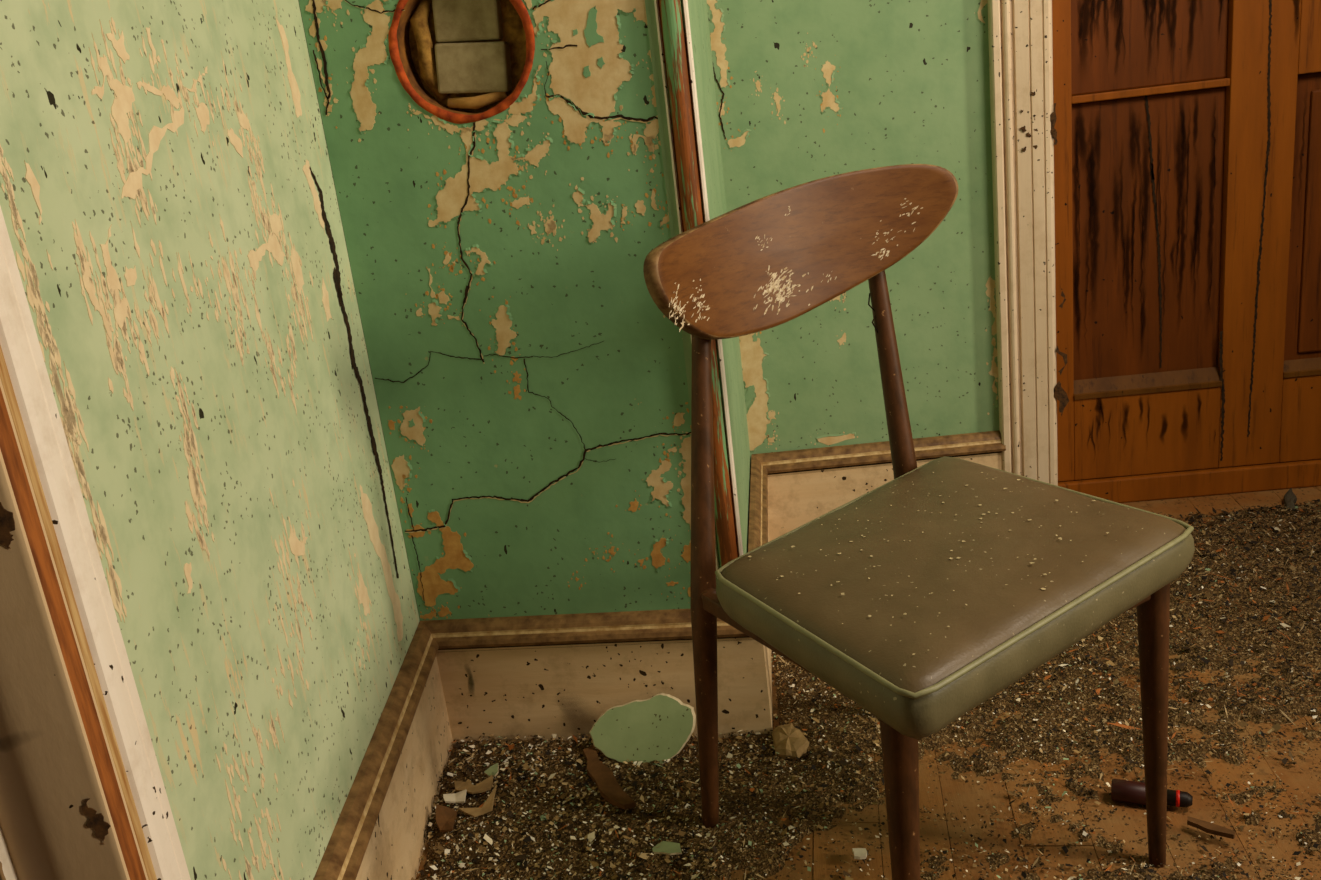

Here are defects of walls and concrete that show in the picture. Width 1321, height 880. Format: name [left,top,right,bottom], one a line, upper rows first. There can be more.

crack [312,0,405,116]
peeling [407,0,669,326]
crack [541,44,658,123]
crack [712,61,726,139]
peeling [707,0,755,150]
crack [310,122,691,599]
peeling [479,296,526,400]
peeling [739,331,780,452]
peeling [388,406,474,619]
peeling [568,402,691,597]
peeling [215,478,316,880]
peeling [82,798,111,844]